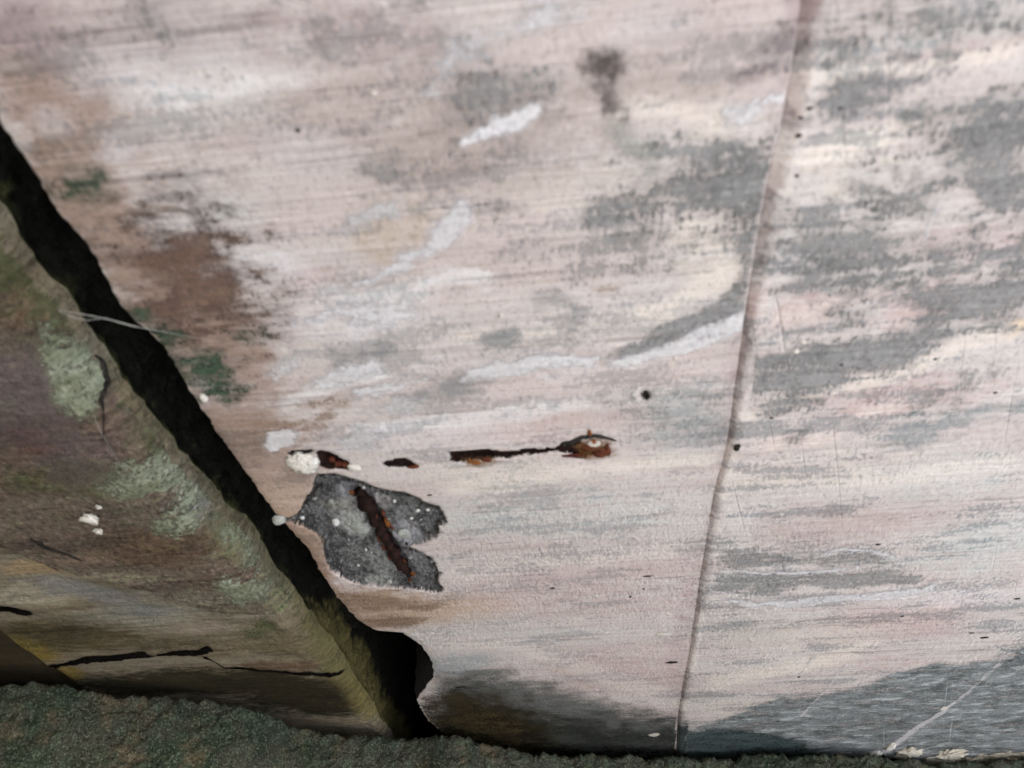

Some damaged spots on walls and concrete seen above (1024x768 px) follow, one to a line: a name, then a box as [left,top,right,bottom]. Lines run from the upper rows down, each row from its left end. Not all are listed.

damp [103,192,419,380]
rust [316,450,350,470]
rust [383,458,419,469]
spalling [286,471,448,594]
crack [47,646,344,678]